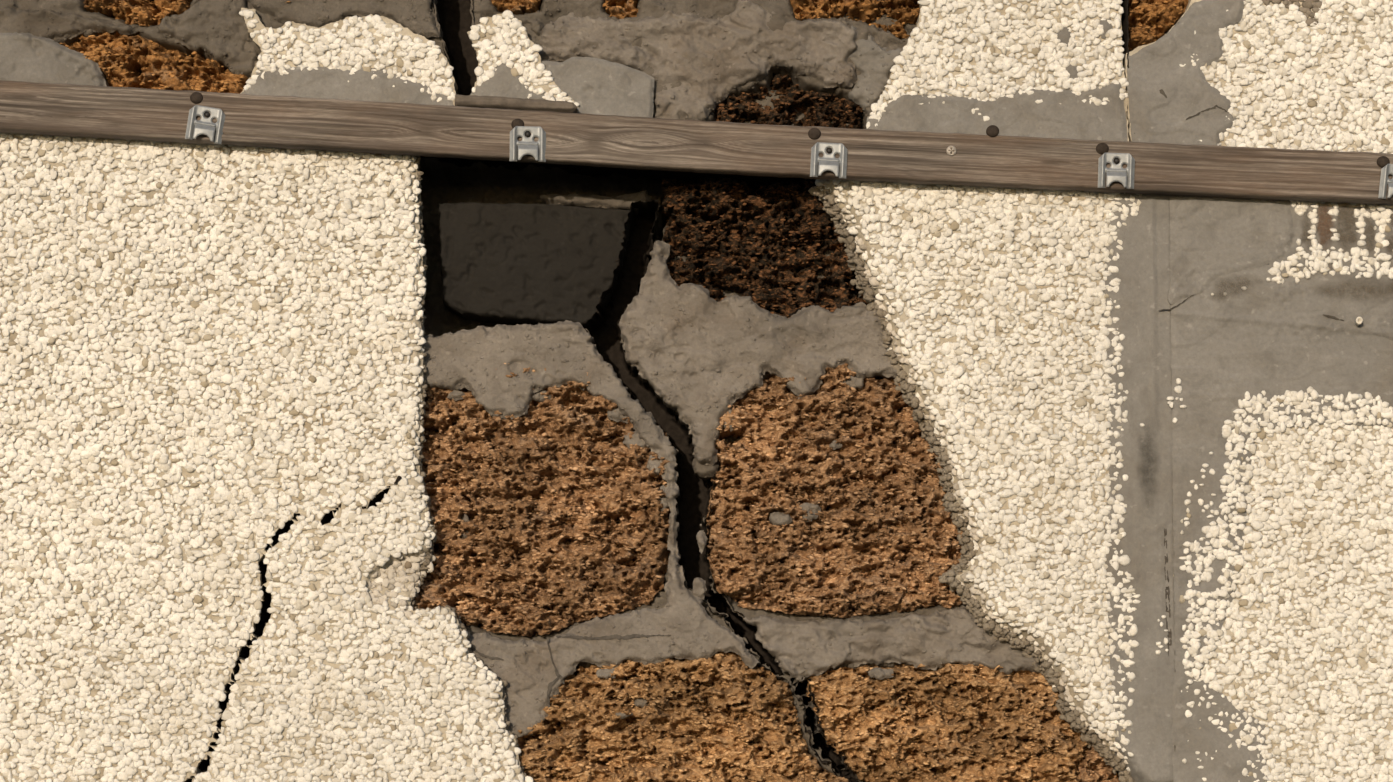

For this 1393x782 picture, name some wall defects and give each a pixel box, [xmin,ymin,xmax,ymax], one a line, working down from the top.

spalling [0,0,1245,146]
crack [185,476,402,782]
crack [471,646,504,660]
crack [547,634,671,708]
crack [581,200,856,782]
spalling [360,156,1393,782]